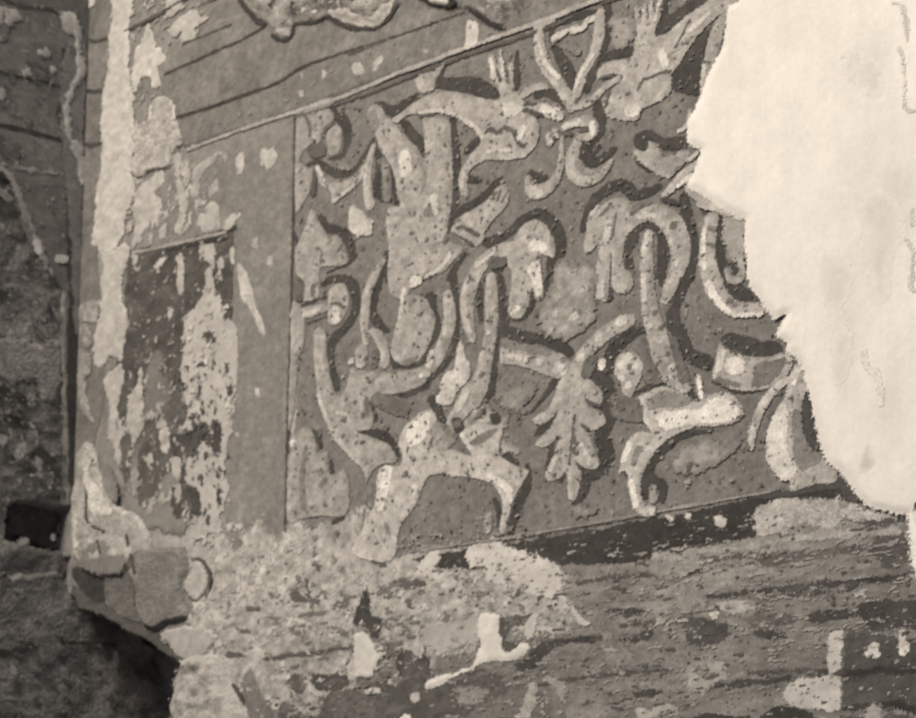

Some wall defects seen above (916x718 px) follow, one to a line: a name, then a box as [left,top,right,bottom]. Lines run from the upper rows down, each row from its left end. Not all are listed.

peeling [607,12,638,50]
crack [892,1,916,113]
spalling [0,0,245,580]
flaking render [683,0,916,582]
crack [904,207,916,293]
peeling [668,436,741,485]
peeling [183,557,208,602]
peeling [413,549,444,580]
peeling [464,536,565,599]
peeling [160,625,219,718]
peeling [353,630,380,679]
peeling [410,611,539,703]